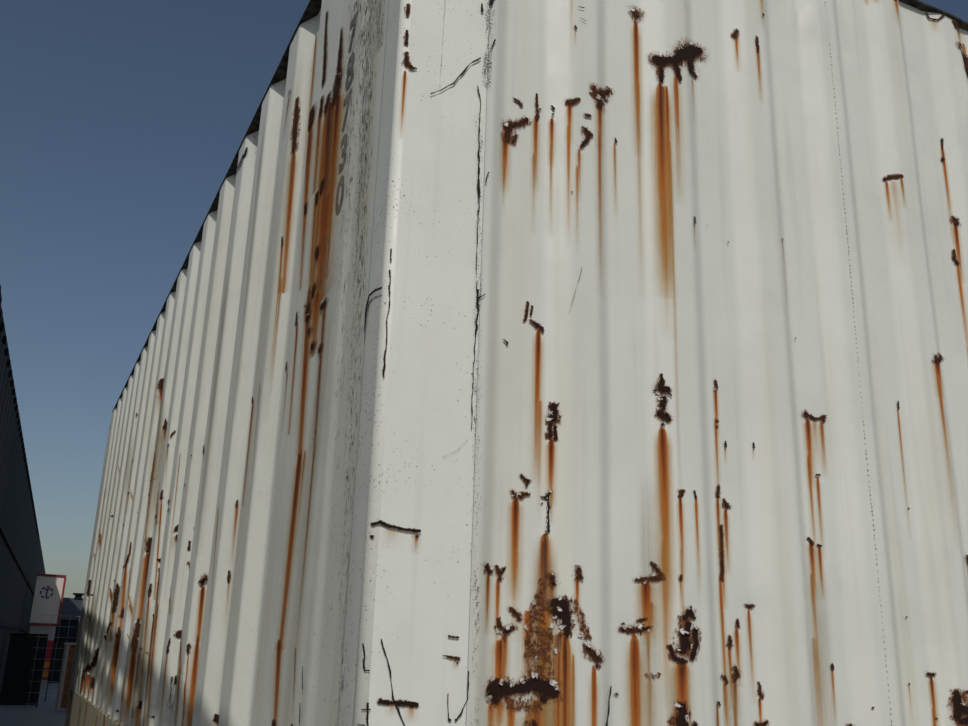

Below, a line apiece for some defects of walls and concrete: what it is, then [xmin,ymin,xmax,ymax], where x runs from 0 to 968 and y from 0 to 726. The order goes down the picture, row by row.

corrosion [500,83,615,214]
corrosion [628,5,709,265]
corrosion [941,138,966,324]
corrosion [70,419,191,726]
corrosion [162,507,219,726]
corrosion [274,11,345,726]
crack [381,639,405,726]
corrosion [523,301,562,494]
corrosion [484,474,604,726]
corrosion [618,374,702,726]
corrosion [715,484,756,726]
corrosion [801,409,827,626]